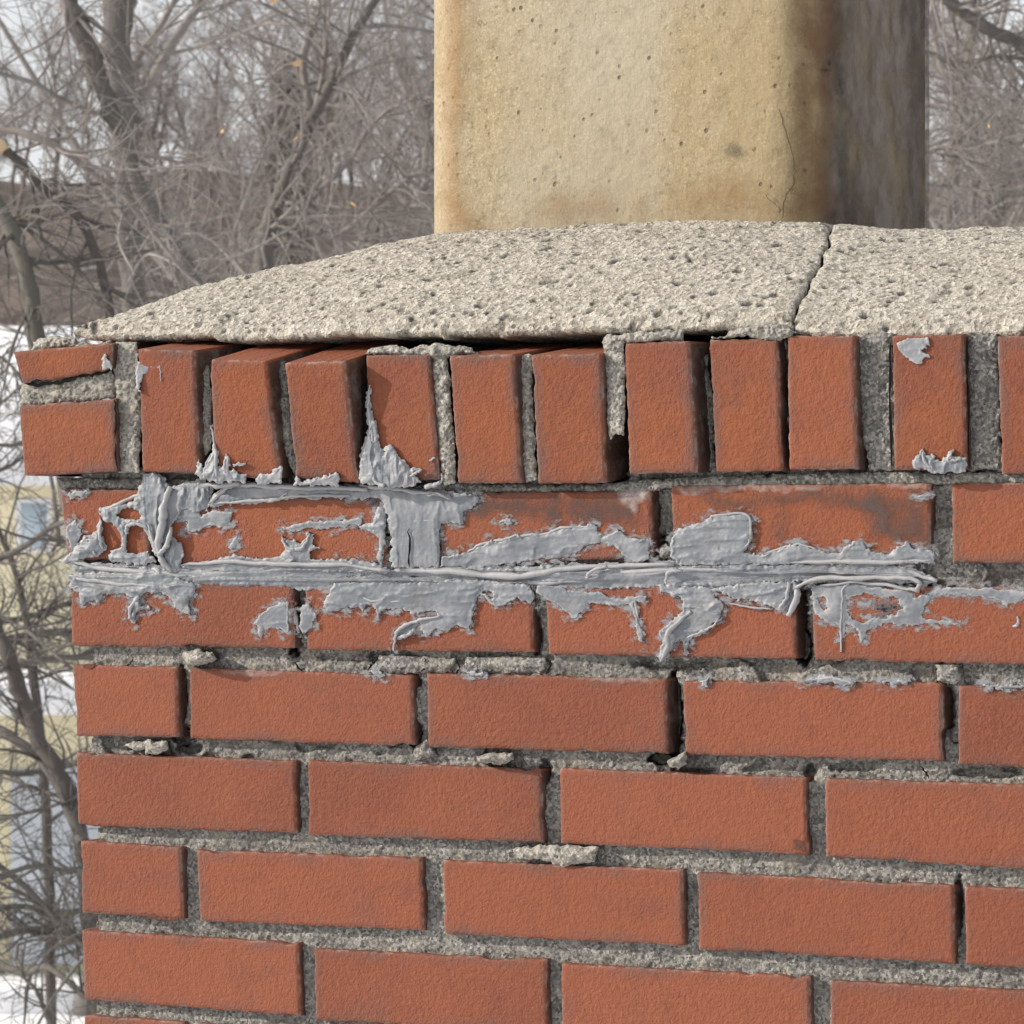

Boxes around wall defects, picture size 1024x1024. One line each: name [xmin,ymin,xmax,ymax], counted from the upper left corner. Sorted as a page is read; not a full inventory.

crack [764,109,797,219]
crack [794,232,832,320]
peeling [897,337,930,364]
peeling [59,388,1024,662]
peeling [807,674,856,686]
peeling [983,683,1024,691]